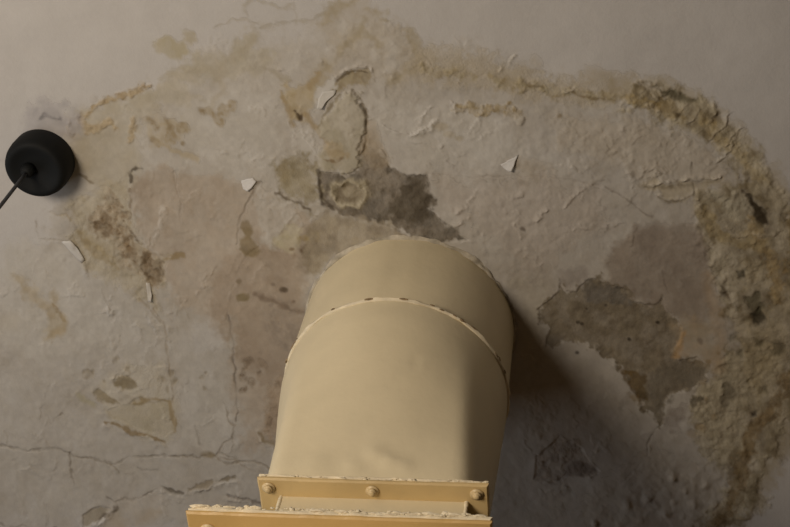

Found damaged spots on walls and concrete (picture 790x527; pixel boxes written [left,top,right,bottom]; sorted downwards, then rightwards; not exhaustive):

water stain [0,25,328,527]
crack [215,257,270,473]
peeling [239,357,284,456]
spalling [269,151,467,276]
water stain [259,0,790,527]
spalling [537,271,711,435]
peeling [637,162,724,205]